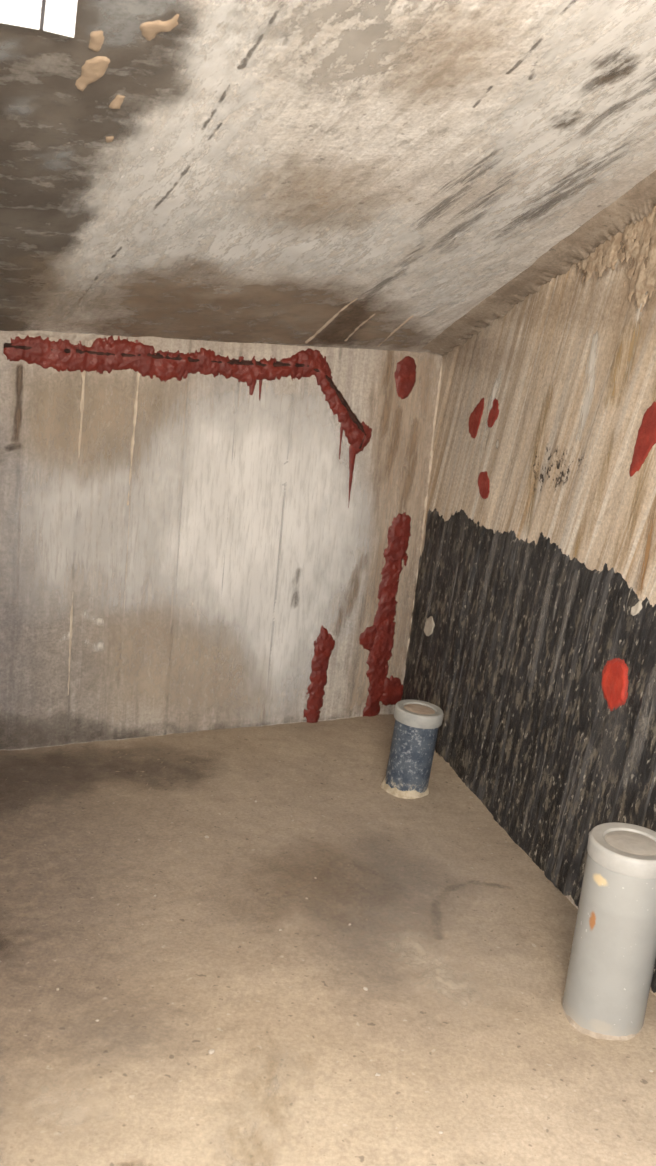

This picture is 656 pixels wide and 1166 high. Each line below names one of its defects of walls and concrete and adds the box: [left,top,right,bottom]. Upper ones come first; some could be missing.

peeling [75,30,110,92]
peeling [109,95,125,109]
peeling [140,14,179,41]
crack [202,11,278,139]
crack [155,167,189,209]
damp [0,0,656,723]
corrosion [6,365,23,450]
damp [629,665,656,763]